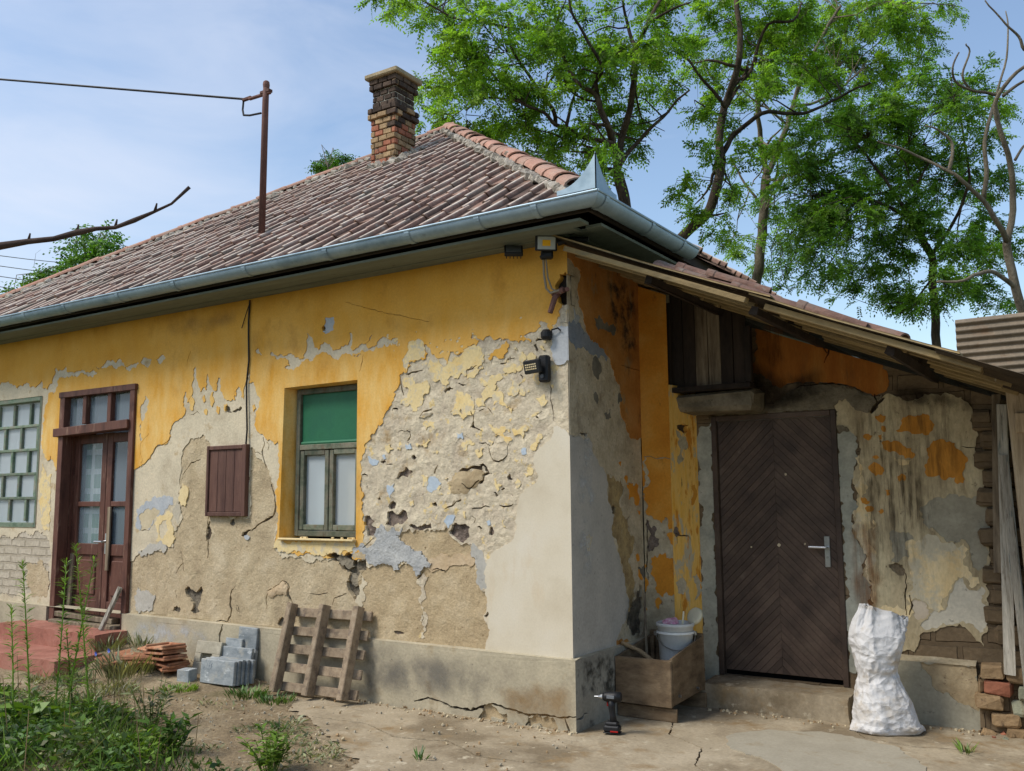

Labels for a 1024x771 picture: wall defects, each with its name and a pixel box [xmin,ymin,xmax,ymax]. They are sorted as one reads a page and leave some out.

peeling [0,355,165,605]
peeling [129,258,701,649]
flaking render [861,411,1024,647]
crack [417,697,579,725]